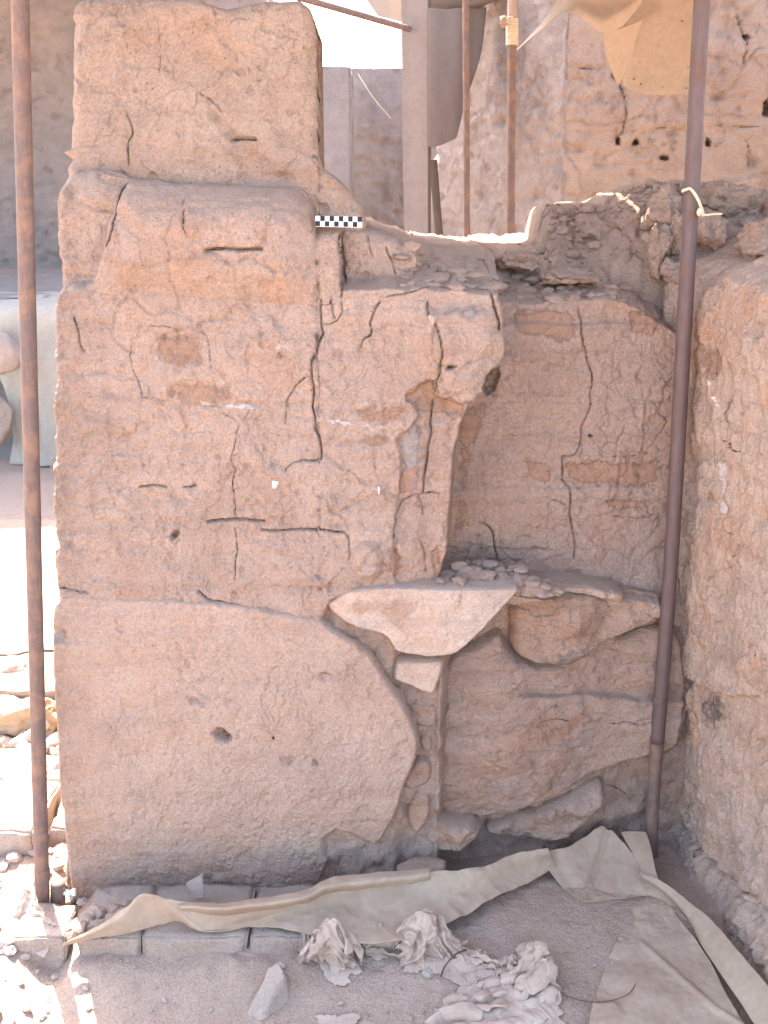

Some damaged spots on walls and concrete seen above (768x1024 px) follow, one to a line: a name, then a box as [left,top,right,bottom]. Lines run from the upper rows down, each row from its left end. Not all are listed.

crack [211,448,288,578]
crack [285,233,346,445]
crack [555,317,593,558]